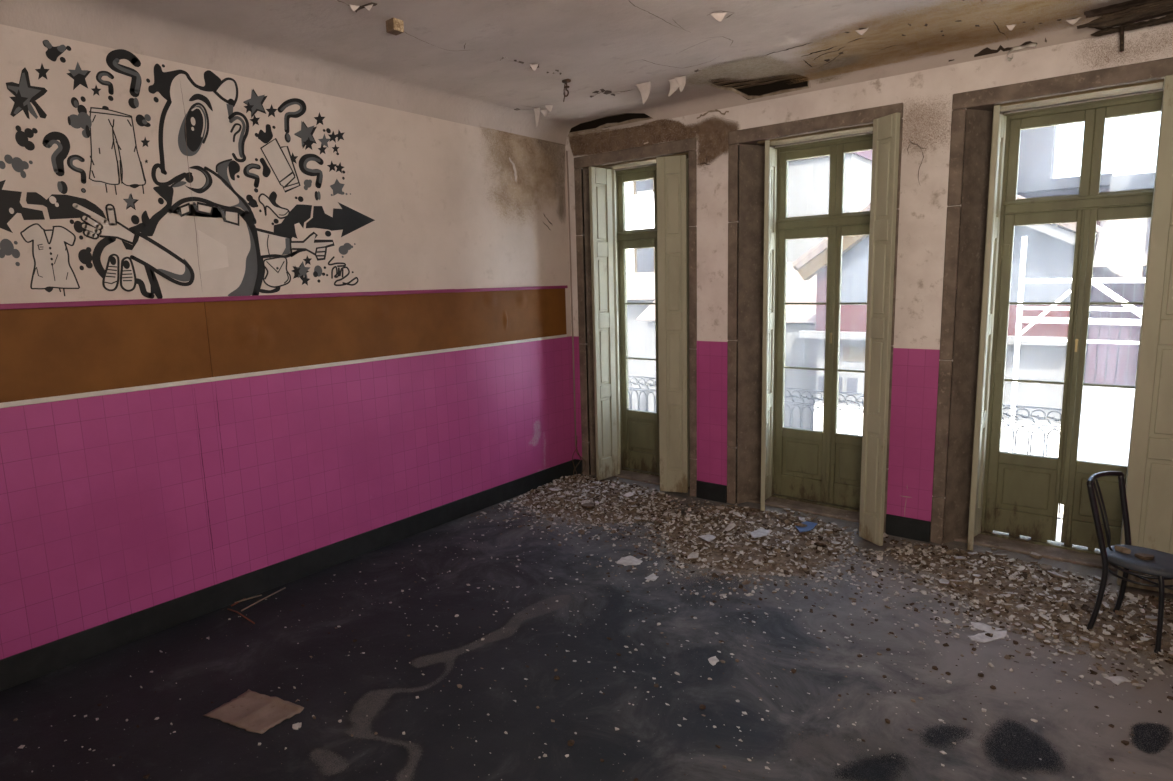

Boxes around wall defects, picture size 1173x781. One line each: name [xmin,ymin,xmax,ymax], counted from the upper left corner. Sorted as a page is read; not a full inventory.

spalling [668,69,811,100]
leakage [685,0,1173,86]
leakage [475,127,566,230]
leakage [687,115,740,168]